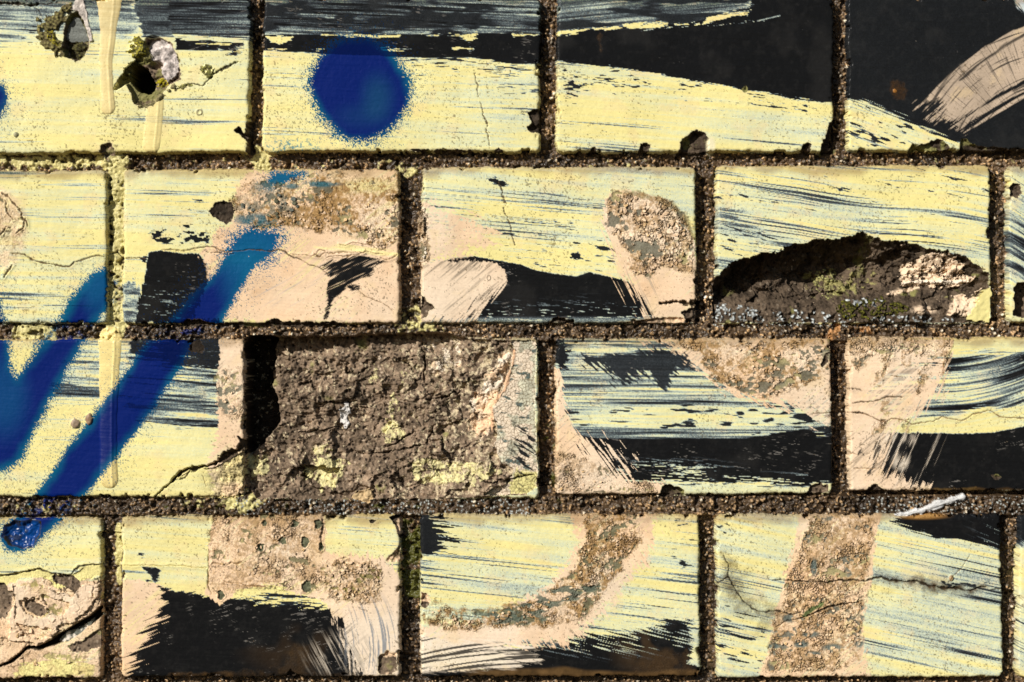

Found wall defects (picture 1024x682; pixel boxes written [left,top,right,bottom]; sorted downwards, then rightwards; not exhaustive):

spalling [36,0,93,63]
spalling [135,71,157,95]
peeling [209,168,432,263]
peeling [603,188,697,280]
spalling [619,232,992,438]
crack [156,436,258,499]
spalling [181,318,685,606]
peeling [417,510,645,633]
peeling [761,510,883,675]
crack [717,550,1001,638]